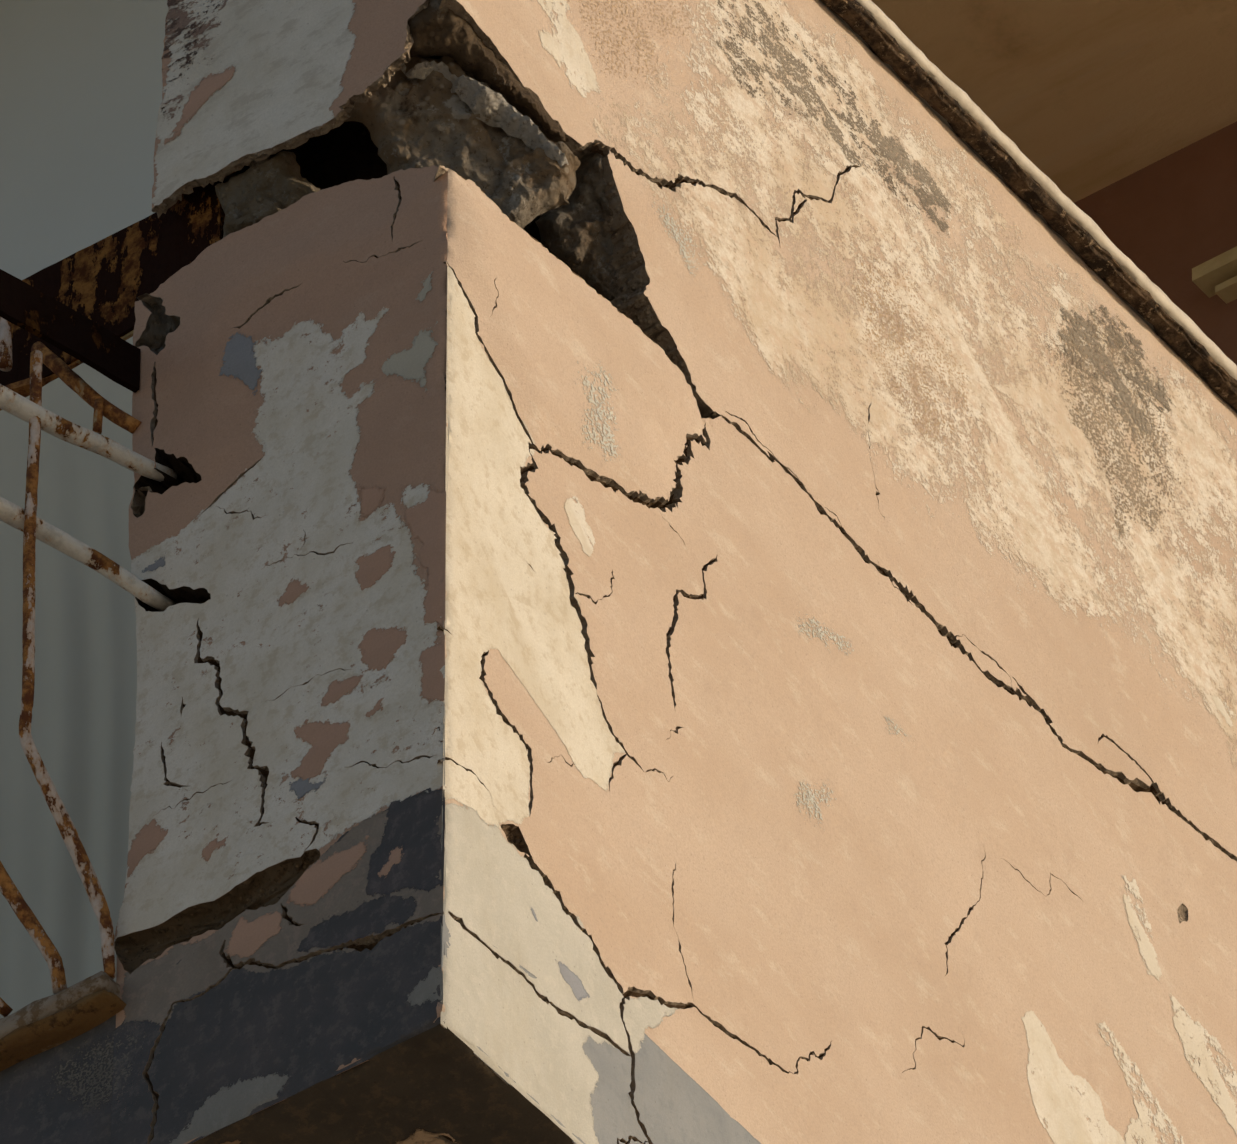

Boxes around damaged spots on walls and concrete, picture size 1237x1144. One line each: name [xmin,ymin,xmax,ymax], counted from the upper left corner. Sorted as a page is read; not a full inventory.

crack [590,142,859,245]
damp [713,0,958,235]
peeling [152,0,1237,768]
damp [852,255,973,457]
damp [1046,304,1185,567]
crack [443,261,1237,861]
crack [161,619,319,854]
peeling [114,265,681,1144]
crack [142,853,831,1144]
crack [945,850,1081,975]
peeling [1021,1010,1185,1144]
peeling [1170,993,1237,1135]